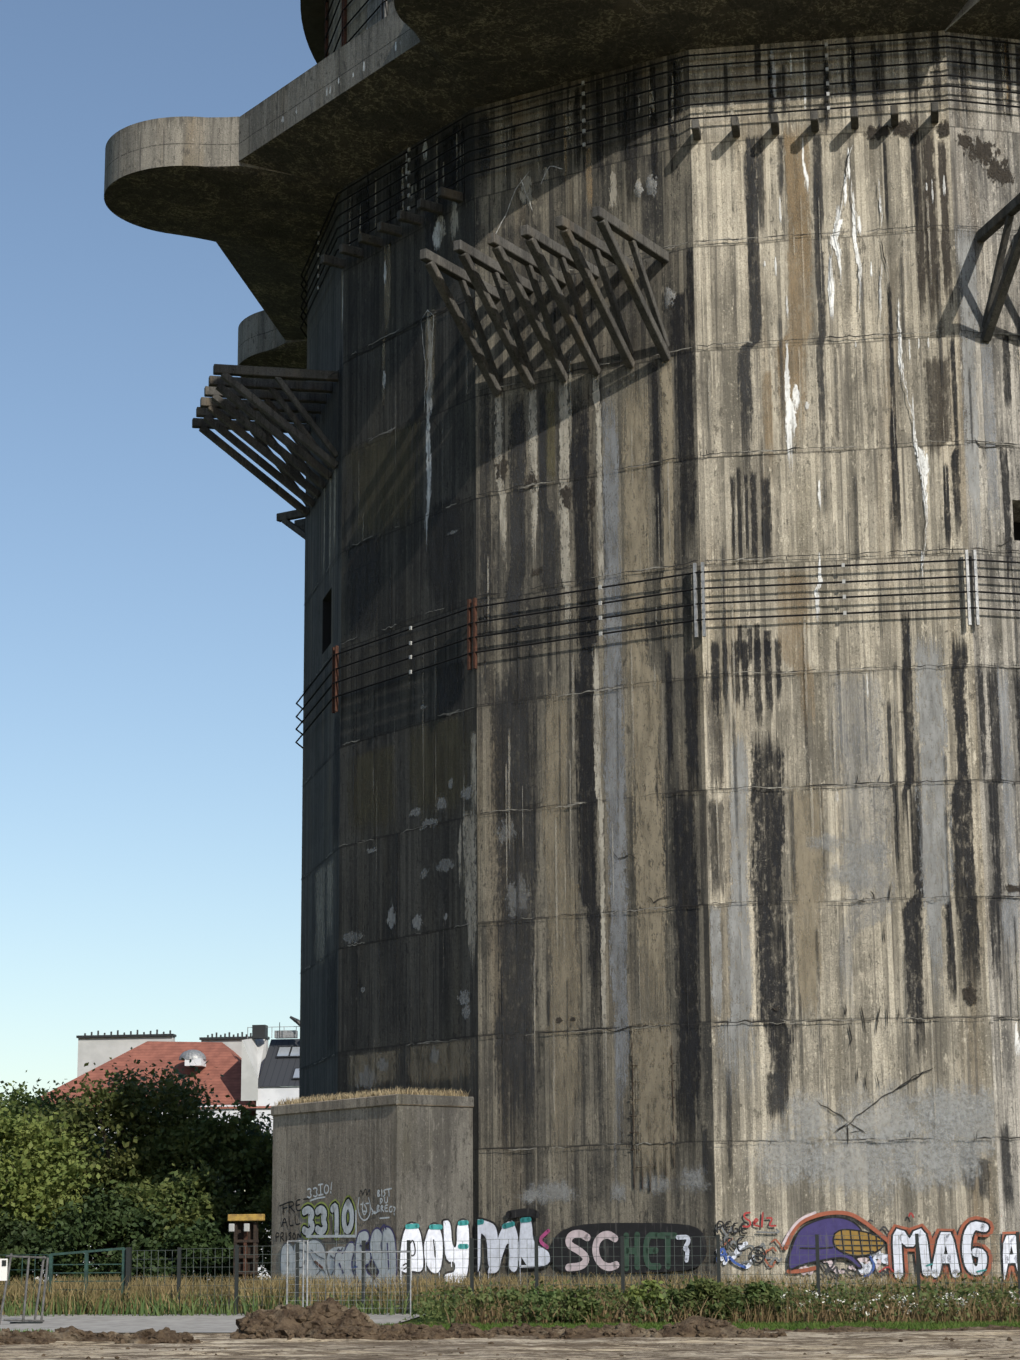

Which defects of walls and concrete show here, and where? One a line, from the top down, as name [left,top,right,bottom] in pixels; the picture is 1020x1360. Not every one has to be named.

water stain [425,310,464,613]
water stain [433,30,1020,1175]
peeling [409,779,471,829]
peeling [387,905,396,929]
peeling [457,989,470,1019]
water stain [959,1126,1014,1207]